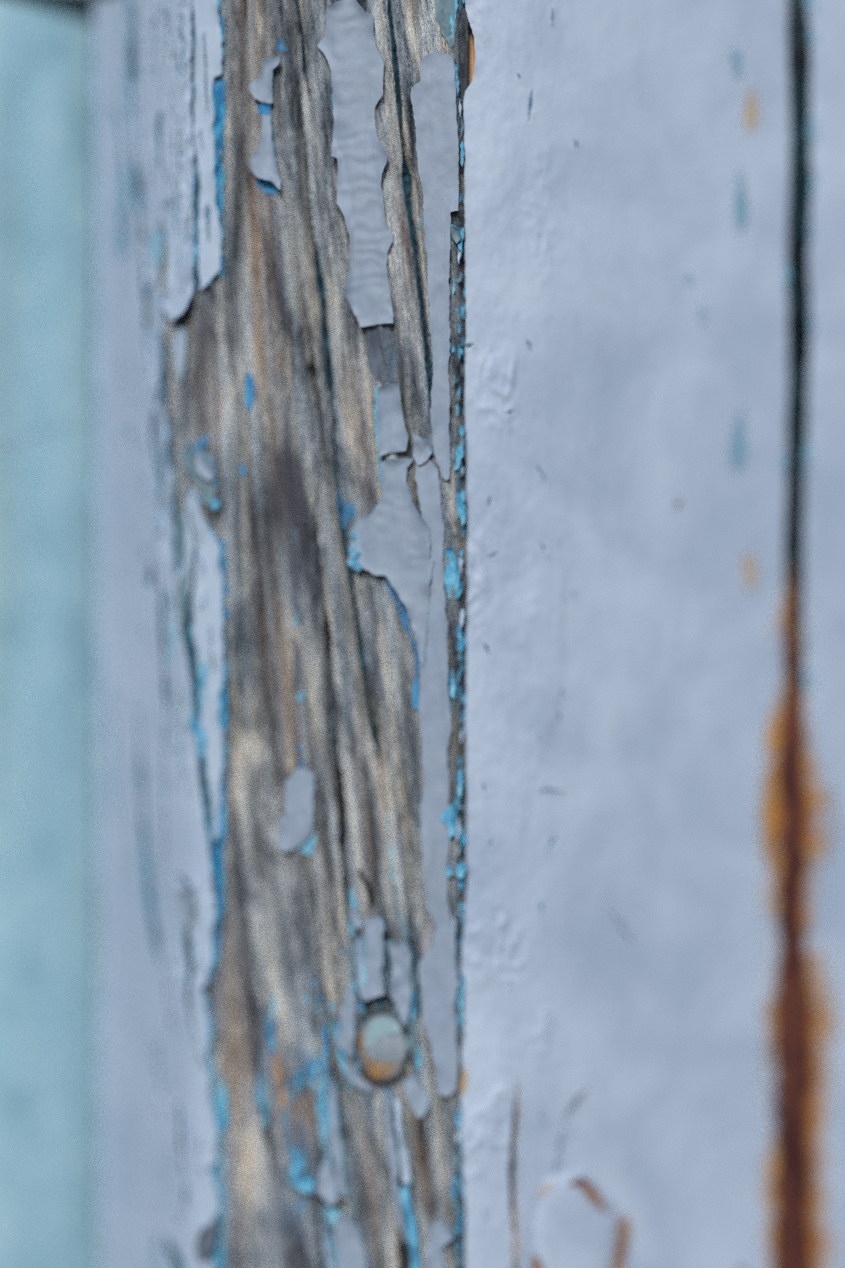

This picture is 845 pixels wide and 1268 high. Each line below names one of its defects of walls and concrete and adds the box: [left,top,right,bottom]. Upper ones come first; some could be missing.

peeling [213,0,226,231]
peeling [248,36,287,194]
crack [127,0,215,1071]
peeling [161,433,220,511]
peeling [163,538,229,982]
peeling [196,999,230,1268]
crack [245,971,275,1177]
crack [279,0,420,1152]
peeling [256,0,475,1268]
crack [382,1086,465,1268]
crack [387,0,468,1046]
corrosion [763,581,834,1268]